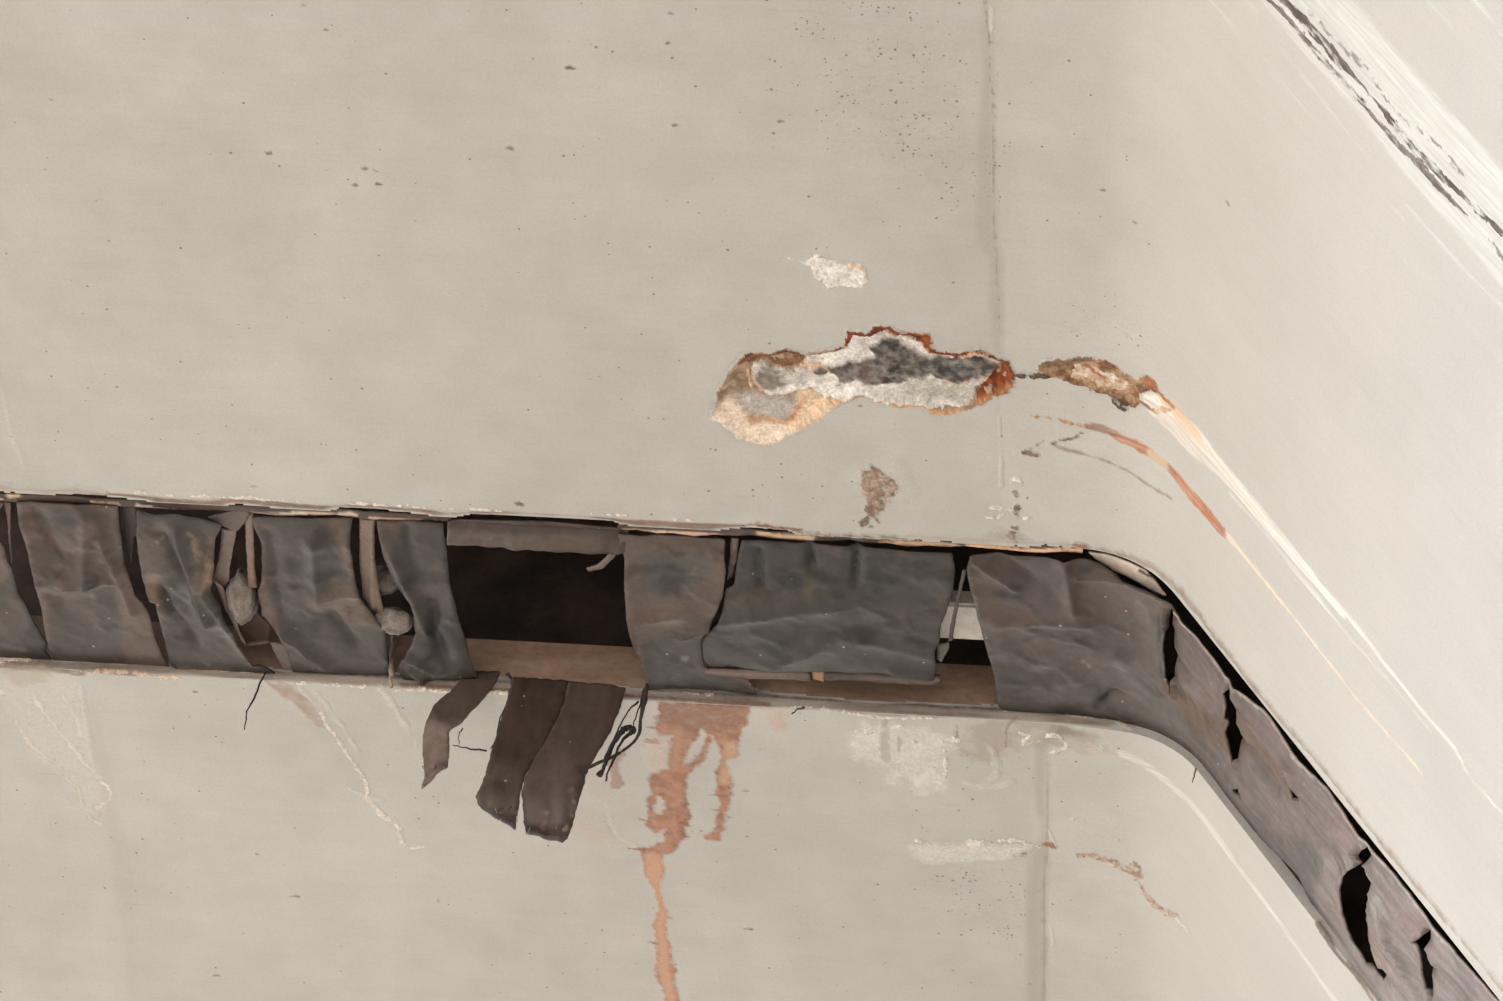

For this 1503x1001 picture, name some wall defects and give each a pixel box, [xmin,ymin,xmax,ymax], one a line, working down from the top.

crack [1266,0,1503,263]
peeling [785,250,869,291]
spalling [707,323,1176,448]
spalling [838,453,922,530]
corrosion [1021,413,1428,783]
peeling [0,660,200,694]
peeling [287,681,370,689]
peeling [394,686,451,695]
corrosion [88,492,1503,1001]
peeling [788,704,943,721]
peeling [897,837,1193,937]
peeling [1314,918,1376,1001]